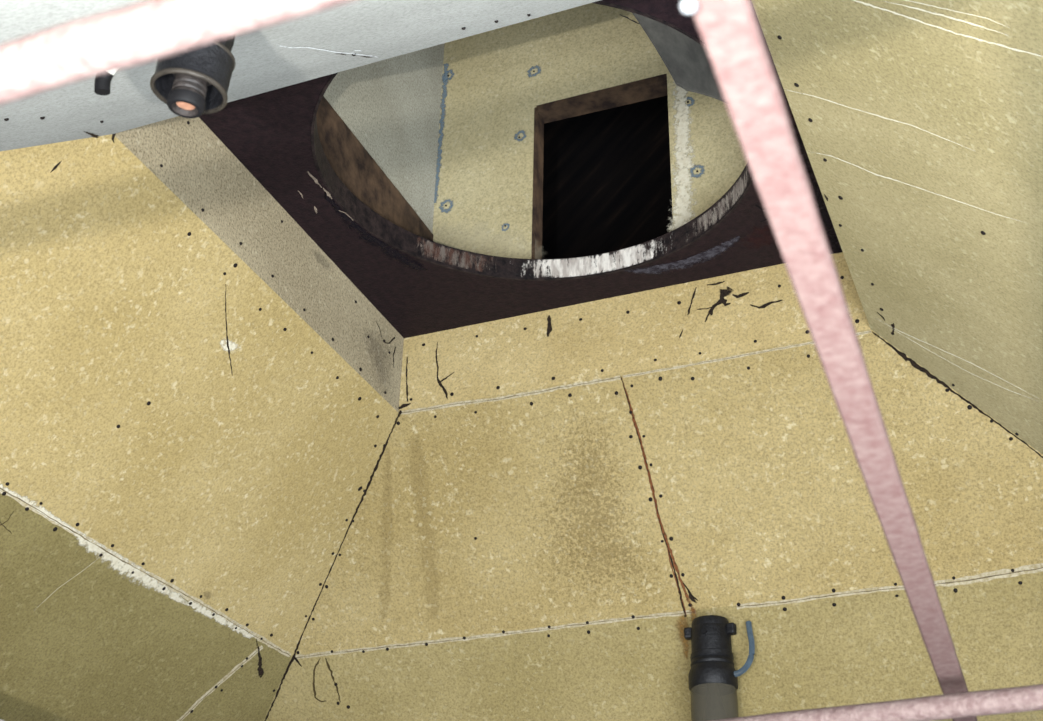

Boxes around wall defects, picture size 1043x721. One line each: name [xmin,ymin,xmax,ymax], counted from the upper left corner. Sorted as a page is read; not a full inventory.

crack [225,284,233,376]
crack [436,342,454,399]
crack [679,281,782,338]
crack [265,322,411,721]
rust [621,377,696,658]
crack [621,378,698,617]